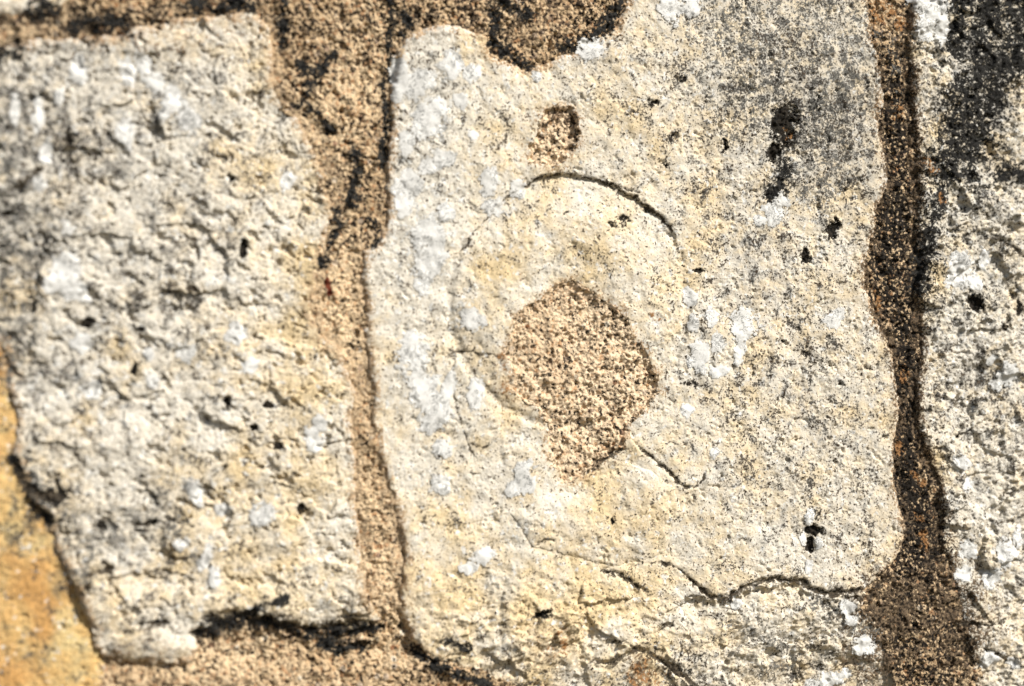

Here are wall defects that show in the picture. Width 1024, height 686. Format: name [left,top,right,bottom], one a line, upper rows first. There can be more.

spalling [528,105,582,167]
crack [461,172,673,250]
spalling [501,280,659,483]
crack [600,562,883,618]